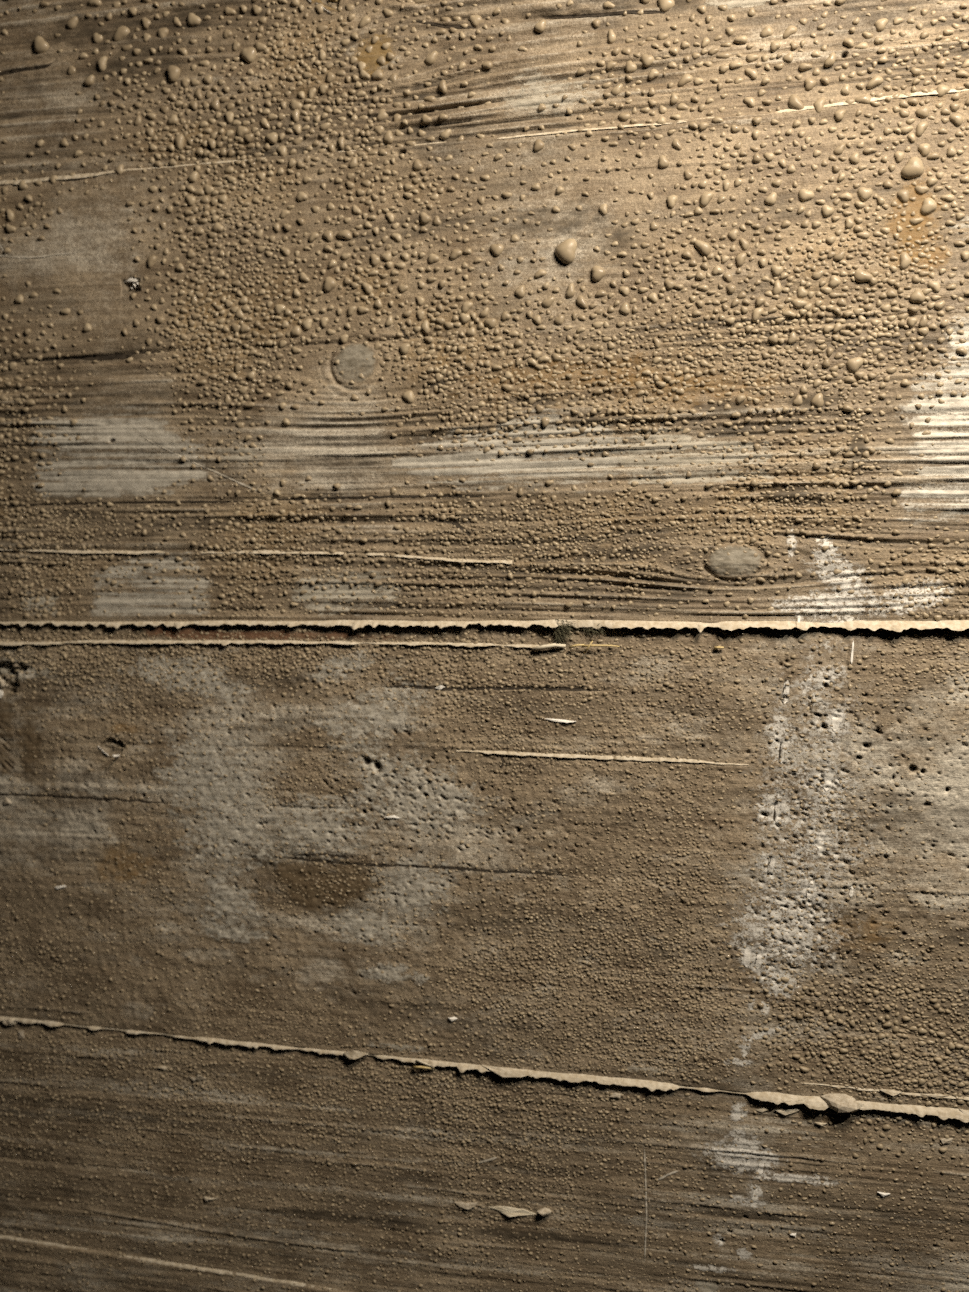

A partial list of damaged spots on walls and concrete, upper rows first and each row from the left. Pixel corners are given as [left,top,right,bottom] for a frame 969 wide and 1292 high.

water stain [771,529,953,623]
water stain [720,640,873,1066]
peeling [344,1050,369,1059]
peeling [482,1065,534,1077]
spalling [756,1093,864,1126]
water stain [704,1103,838,1208]
water stain [694,1234,751,1292]